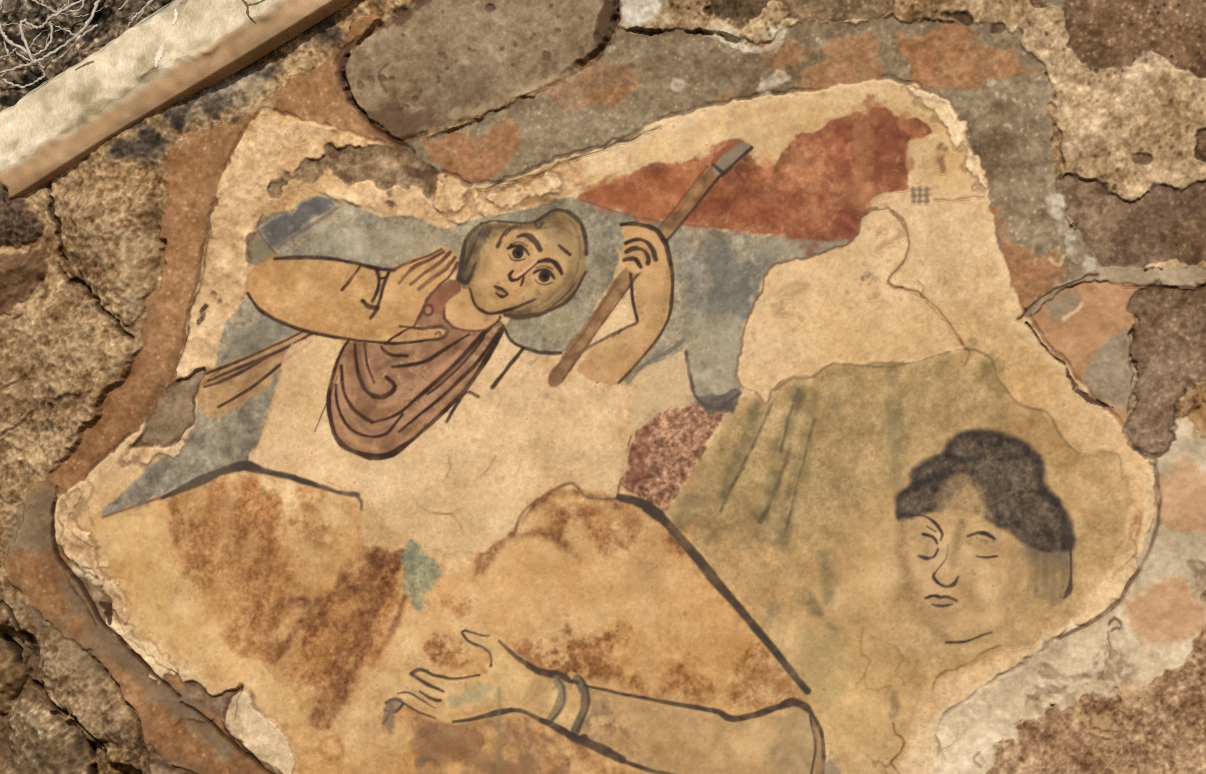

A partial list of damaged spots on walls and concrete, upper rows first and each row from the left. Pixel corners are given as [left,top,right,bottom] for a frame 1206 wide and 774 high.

spalling [1031,0,1206,79]
peeling [487,173,563,209]
spalling [1056,174,1206,269]
spalling [1132,154,1153,165]
spalling [1195,129,1206,163]
crack [44,183,135,340]
peeling [59,493,296,774]